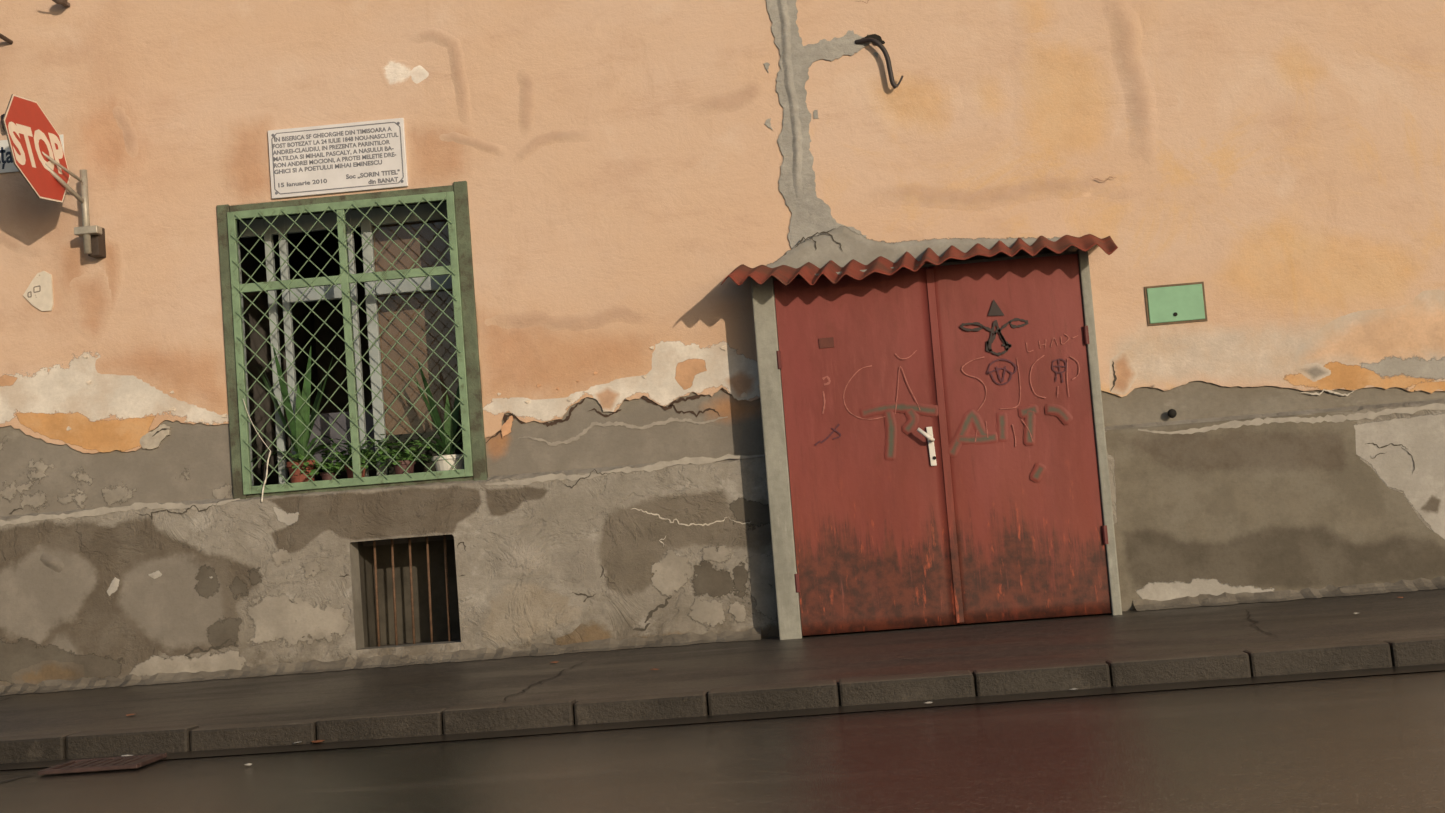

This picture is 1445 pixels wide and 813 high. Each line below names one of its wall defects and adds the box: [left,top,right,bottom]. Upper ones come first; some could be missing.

spalling [0,352,240,526]
spalling [483,341,765,486]
peeling [1098,283,1445,434]
spalling [129,593,350,677]
spalling [651,545,777,631]